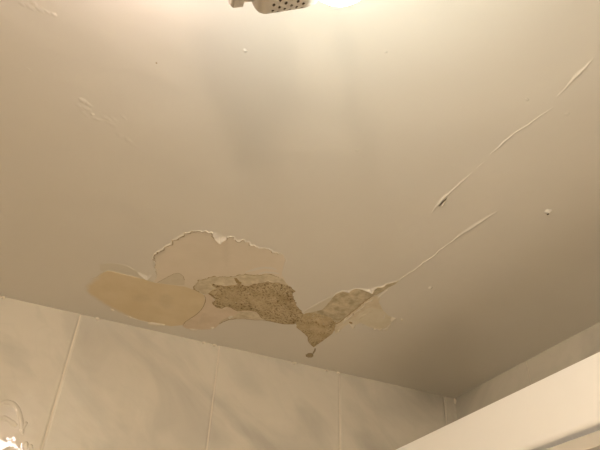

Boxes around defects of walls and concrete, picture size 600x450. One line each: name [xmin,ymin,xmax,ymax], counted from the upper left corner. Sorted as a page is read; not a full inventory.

crack [432,57,594,213]
leakage [84,262,205,326]
peeling [151,230,399,347]
crack [399,211,498,280]